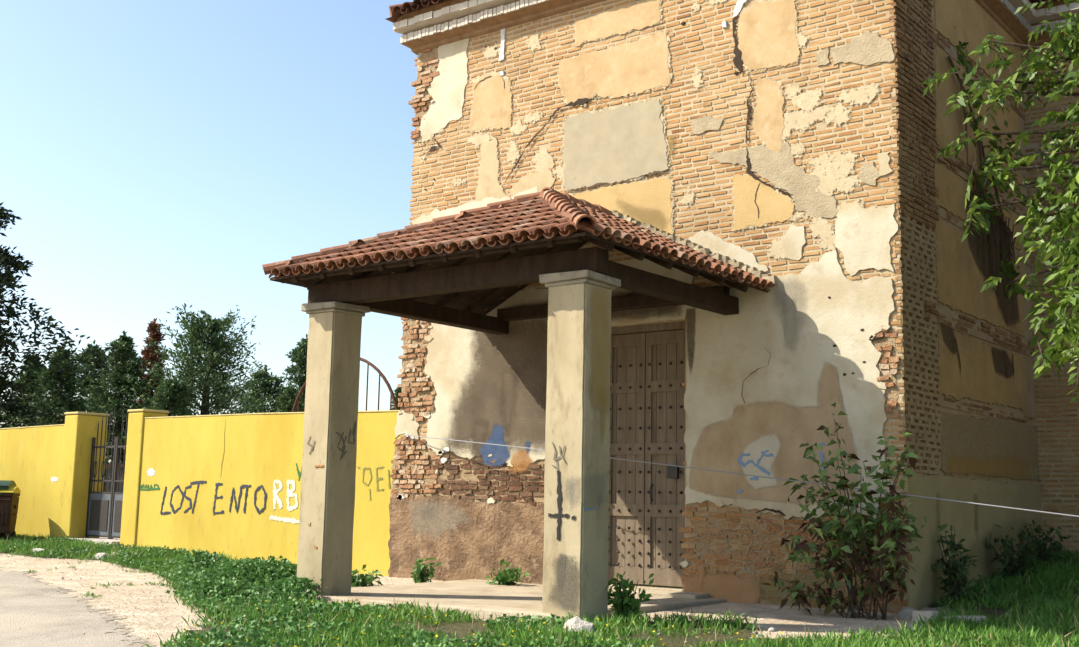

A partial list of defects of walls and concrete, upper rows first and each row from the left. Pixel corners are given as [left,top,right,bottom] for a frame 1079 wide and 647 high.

spalling [408,48,439,140]
crack [505,93,600,198]
crack [732,15,792,216]
spalling [397,317,437,426]
spalling [390,434,545,505]
damp [556,553,567,590]
spalling [679,499,908,613]